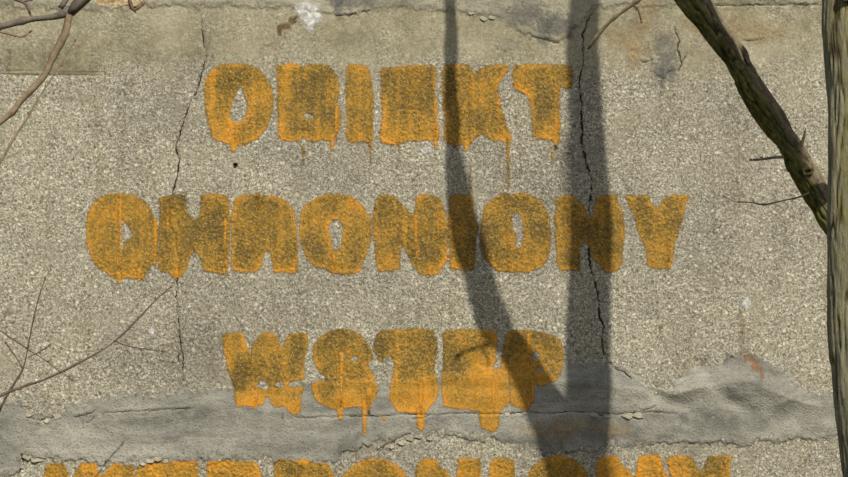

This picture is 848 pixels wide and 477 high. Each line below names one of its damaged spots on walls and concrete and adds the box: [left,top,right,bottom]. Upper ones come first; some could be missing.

crack [168,21,207,215]
crack [536,10,594,220]
crack [175,255,184,380]
crack [588,244,632,379]